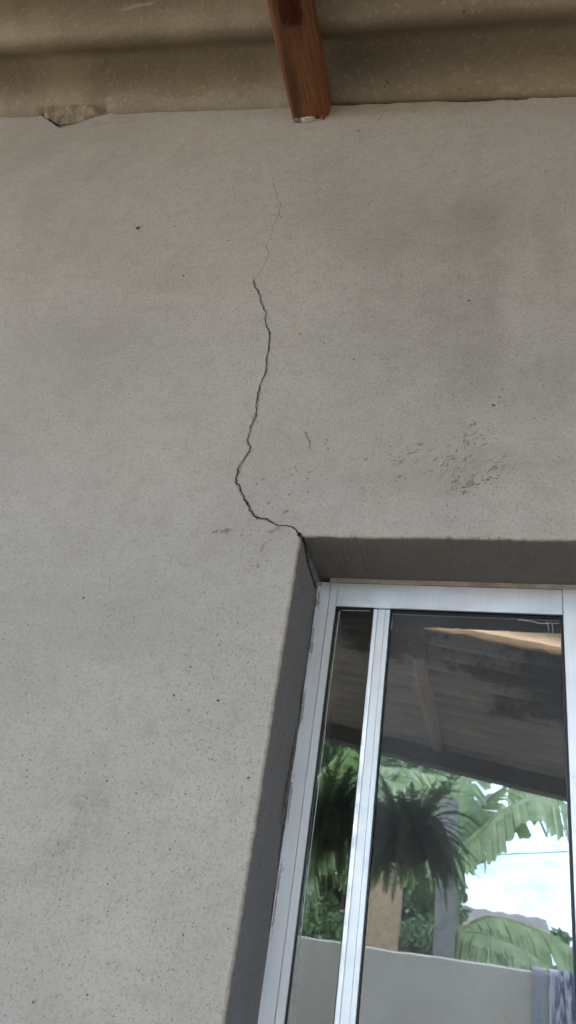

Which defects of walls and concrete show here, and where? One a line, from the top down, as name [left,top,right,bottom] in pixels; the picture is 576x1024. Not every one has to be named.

spalling [44,105,111,128]
crack [232,178,317,758]